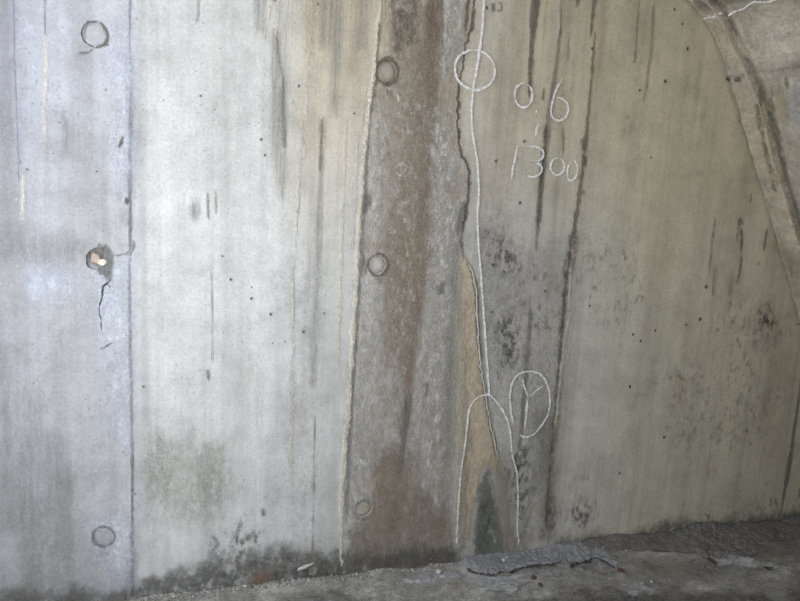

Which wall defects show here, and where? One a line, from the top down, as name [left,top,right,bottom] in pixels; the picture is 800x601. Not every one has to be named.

crack [456,0,475,258]
leakage [28,264,72,300]
spalling [89,244,112,280]
crack [99,278,111,349]
leakage [55,0,464,601]
leakage [488,0,595,527]
leakage [474,473,518,556]